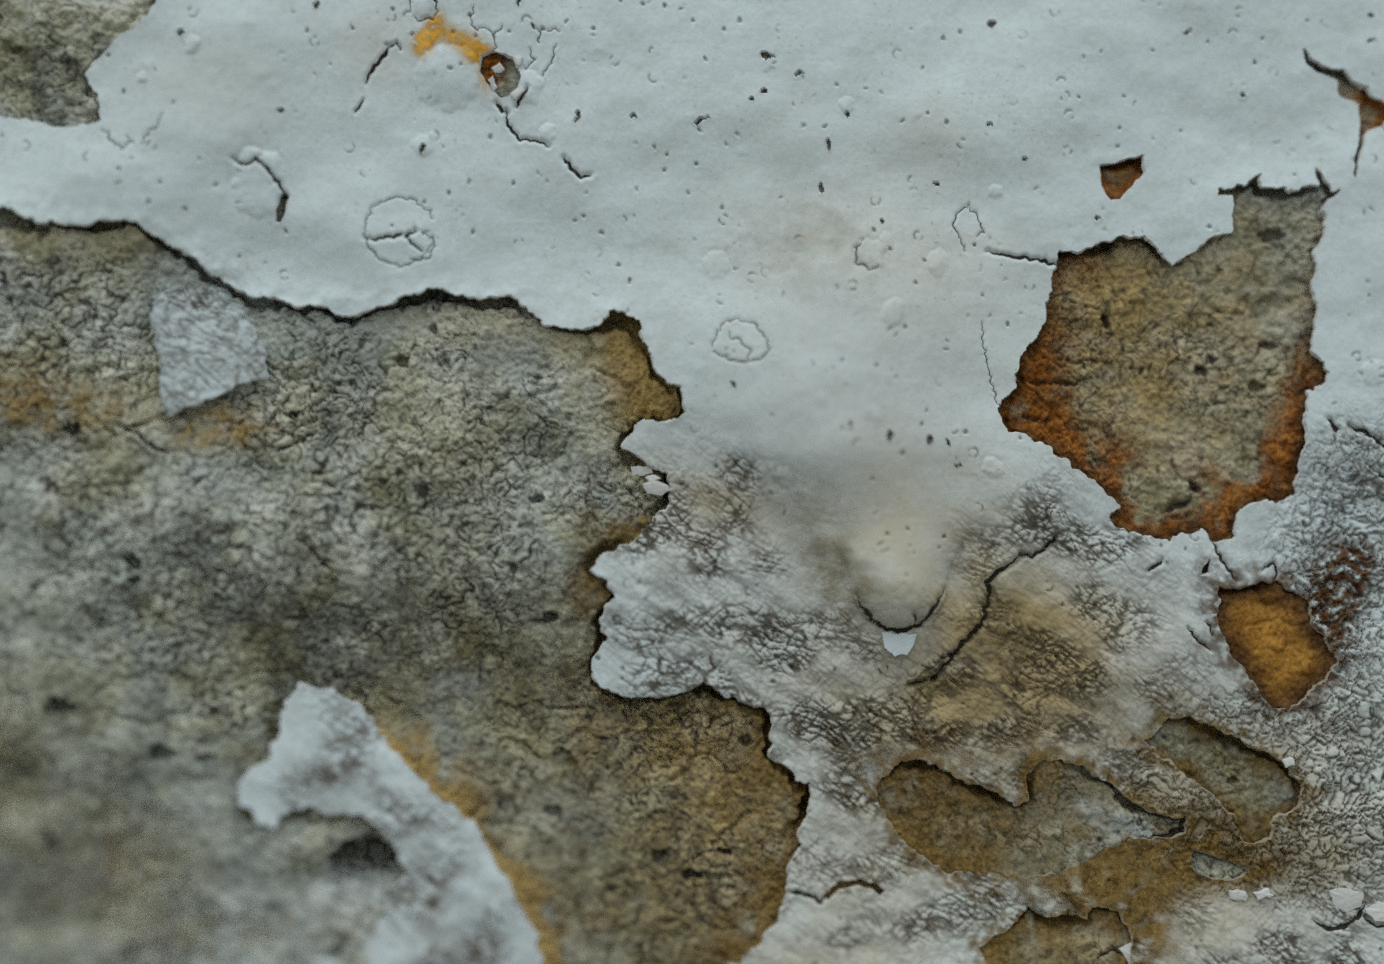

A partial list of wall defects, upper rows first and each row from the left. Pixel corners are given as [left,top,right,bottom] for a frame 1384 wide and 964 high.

peeling [0,0,156,127]
corrosion [413,16,504,86]
peeling [1099,154,1146,201]
corrosion [998,322,1323,542]
peeling [997,167,1341,711]
peeling [0,206,812,964]
corrosion [1204,543,1373,715]
peeling [874,759,1188,879]
peeling [981,906,1133,964]
peeling [1146,716,1304,844]
peeling [1191,850,1274,901]